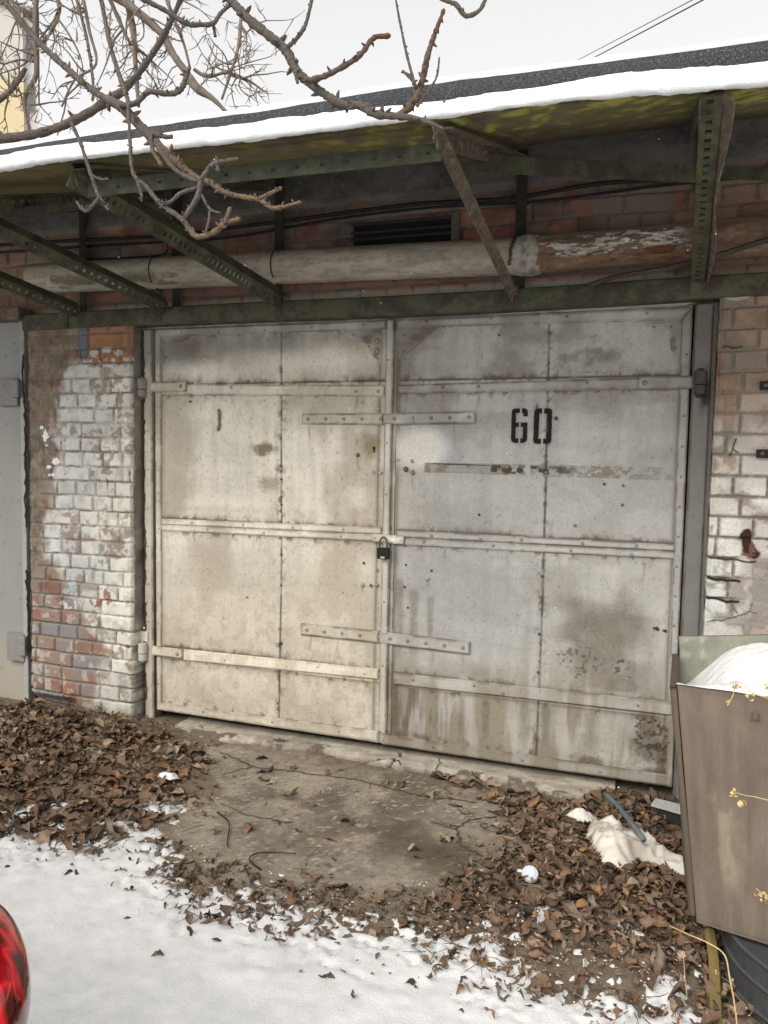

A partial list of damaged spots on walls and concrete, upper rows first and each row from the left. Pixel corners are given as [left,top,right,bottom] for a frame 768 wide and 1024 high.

peeling [538,226,687,257]
peeling [88,346,133,365]
spalling [40,426,61,477]
corrosion [254,444,272,456]
peeling [60,587,112,610]
corrosion [636,716,668,760]
crack [220,752,497,857]